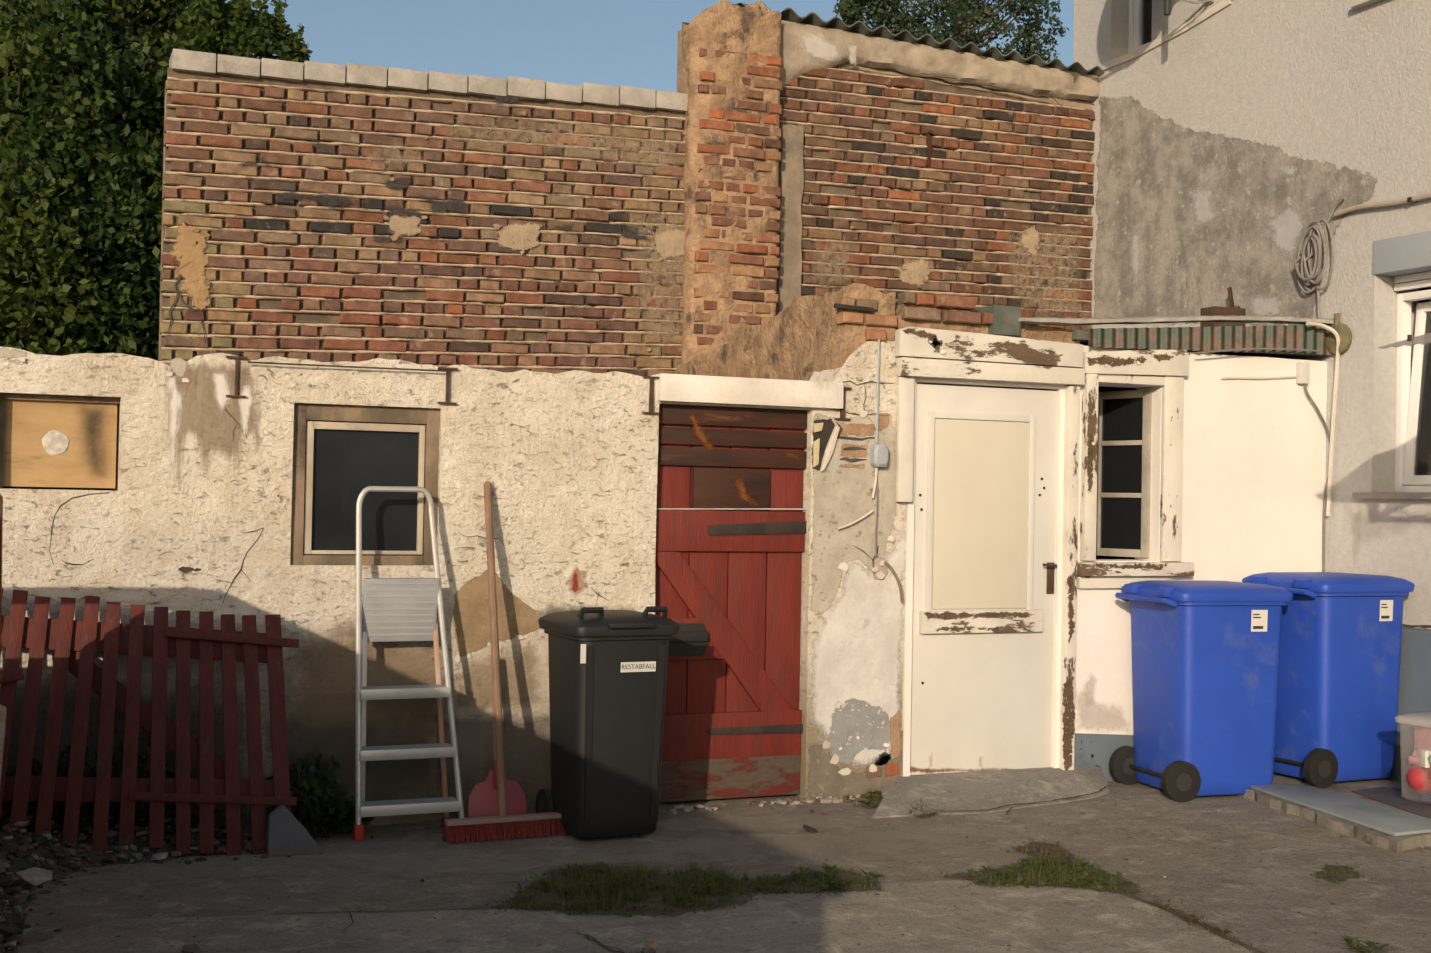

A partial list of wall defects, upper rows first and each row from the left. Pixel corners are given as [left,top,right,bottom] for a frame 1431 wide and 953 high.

peeling [1083,96,1377,326]
water stain [167,365,258,478]
peeling [1087,433,1095,493]
peeling [811,409,903,619]
peeling [451,570,540,707]
peeling [924,611,1035,632]
peeling [1067,576,1075,643]
peeling [1093,563,1167,571]
spalling [807,698,903,798]
peeling [1062,676,1076,770]